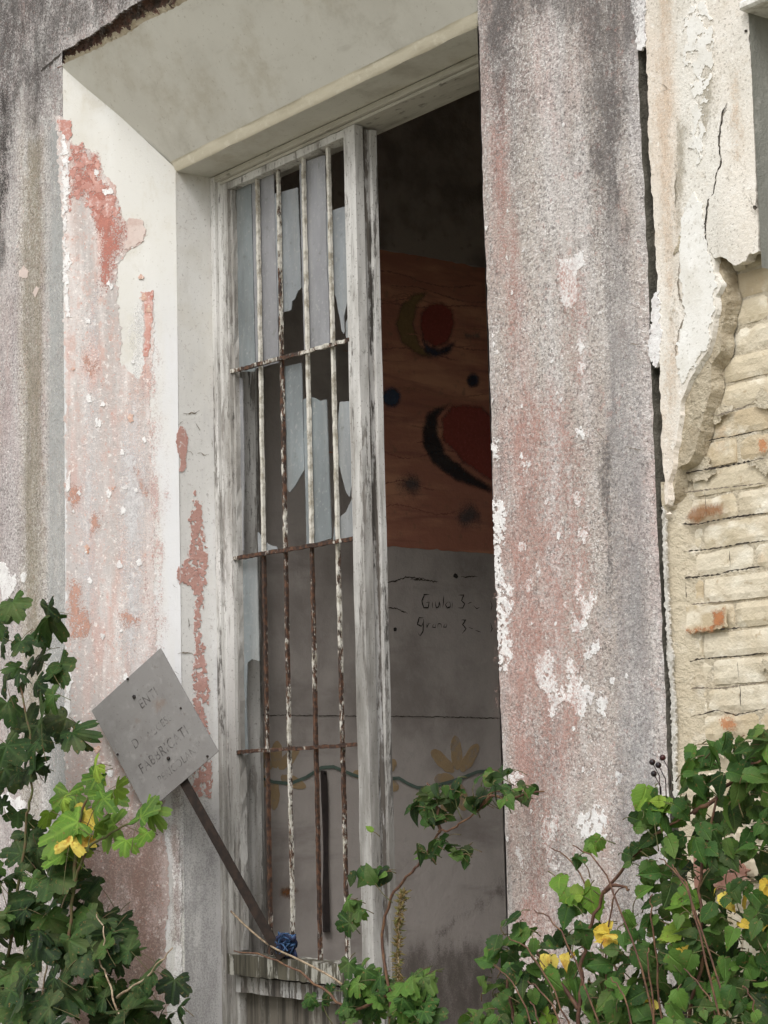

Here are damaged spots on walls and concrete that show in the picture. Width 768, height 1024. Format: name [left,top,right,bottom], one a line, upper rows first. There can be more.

peeling [682,0,715,165]
crack [704,103,728,245]
spalling [647,291,663,368]
peeling [673,192,718,383]
peeling [176,426,188,472]
peeling [55,115,170,1019]
peeling [177,490,211,735]
peeling [492,496,527,587]
peeling [534,561,629,732]
spalling [661,506,680,798]
spalling [686,605,728,634]
peeling [190,760,213,798]